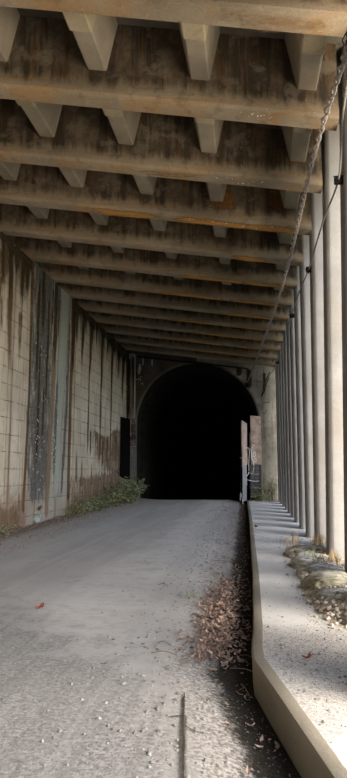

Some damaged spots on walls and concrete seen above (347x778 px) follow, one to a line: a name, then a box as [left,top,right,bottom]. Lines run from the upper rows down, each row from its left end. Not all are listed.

water stain [0,232,153,523]